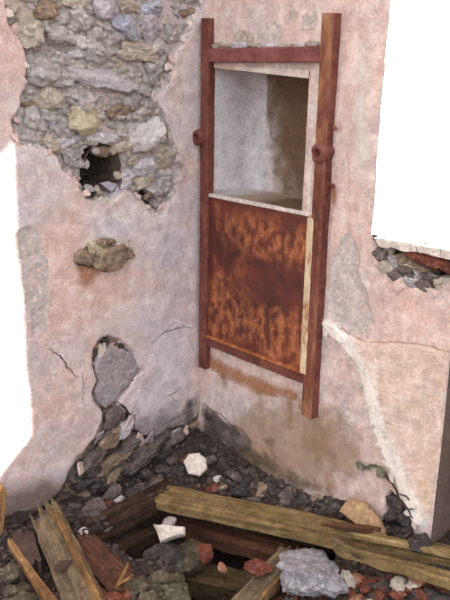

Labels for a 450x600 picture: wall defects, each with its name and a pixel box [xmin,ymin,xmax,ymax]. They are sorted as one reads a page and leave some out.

flaking render [5,0,204,214]